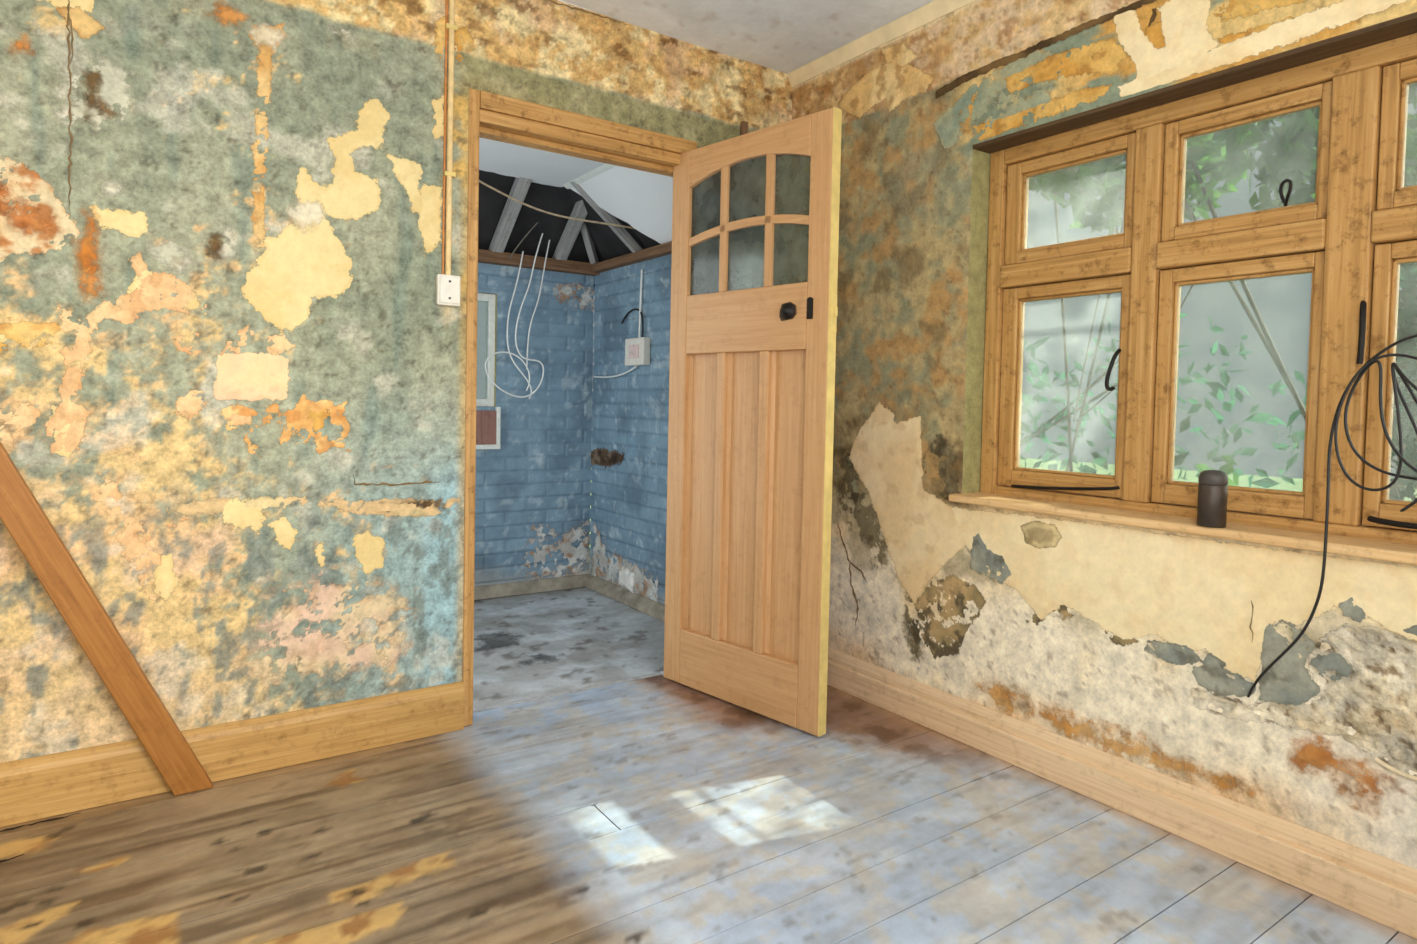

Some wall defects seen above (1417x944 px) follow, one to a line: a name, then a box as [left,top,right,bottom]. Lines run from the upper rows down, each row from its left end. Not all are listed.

peeling [37,0,105,39]
peeling [1145,22,1166,49]
peeling [431,95,447,139]
peeling [934,38,1132,149]
peeling [0,99,443,458]
peeling [222,496,298,550]
peeling [240,530,412,688]
peeling [520,520,660,602]
peeling [914,533,1011,660]
peeling [1020,521,1062,549]
peeling [1026,605,1074,626]
spalling [1105,597,1417,781]